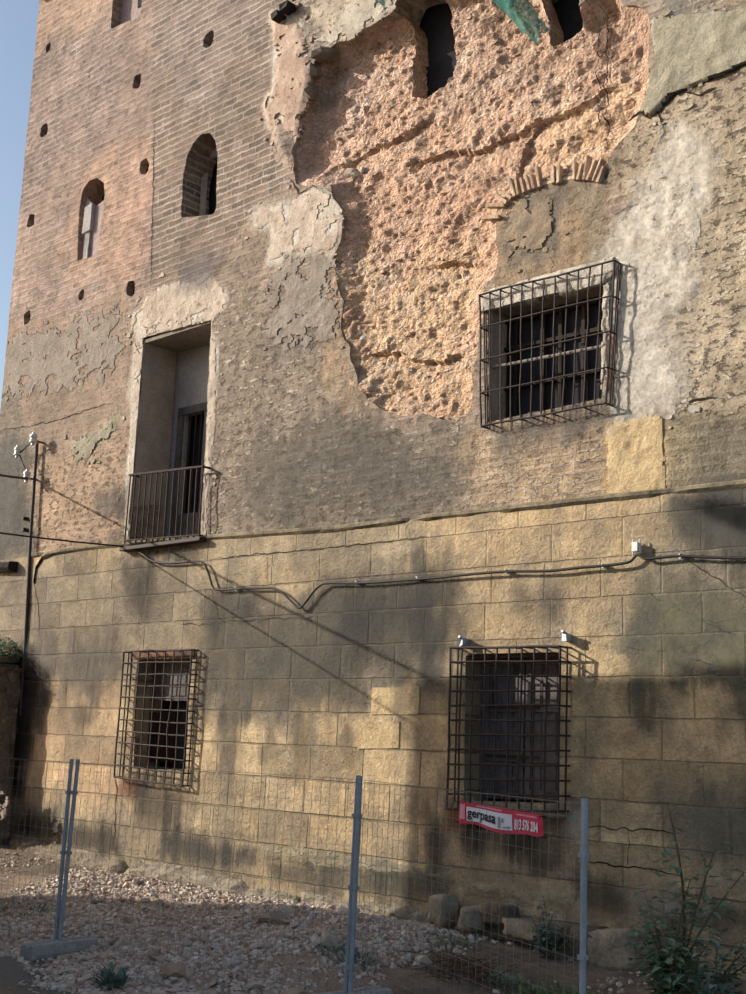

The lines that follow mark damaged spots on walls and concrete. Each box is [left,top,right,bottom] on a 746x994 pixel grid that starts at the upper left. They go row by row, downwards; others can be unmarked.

crack [588,1,746,145]
spalling [248,0,713,494]
leakage [358,821,444,898]
leakage [462,824,548,868]
crack [579,826,680,876]